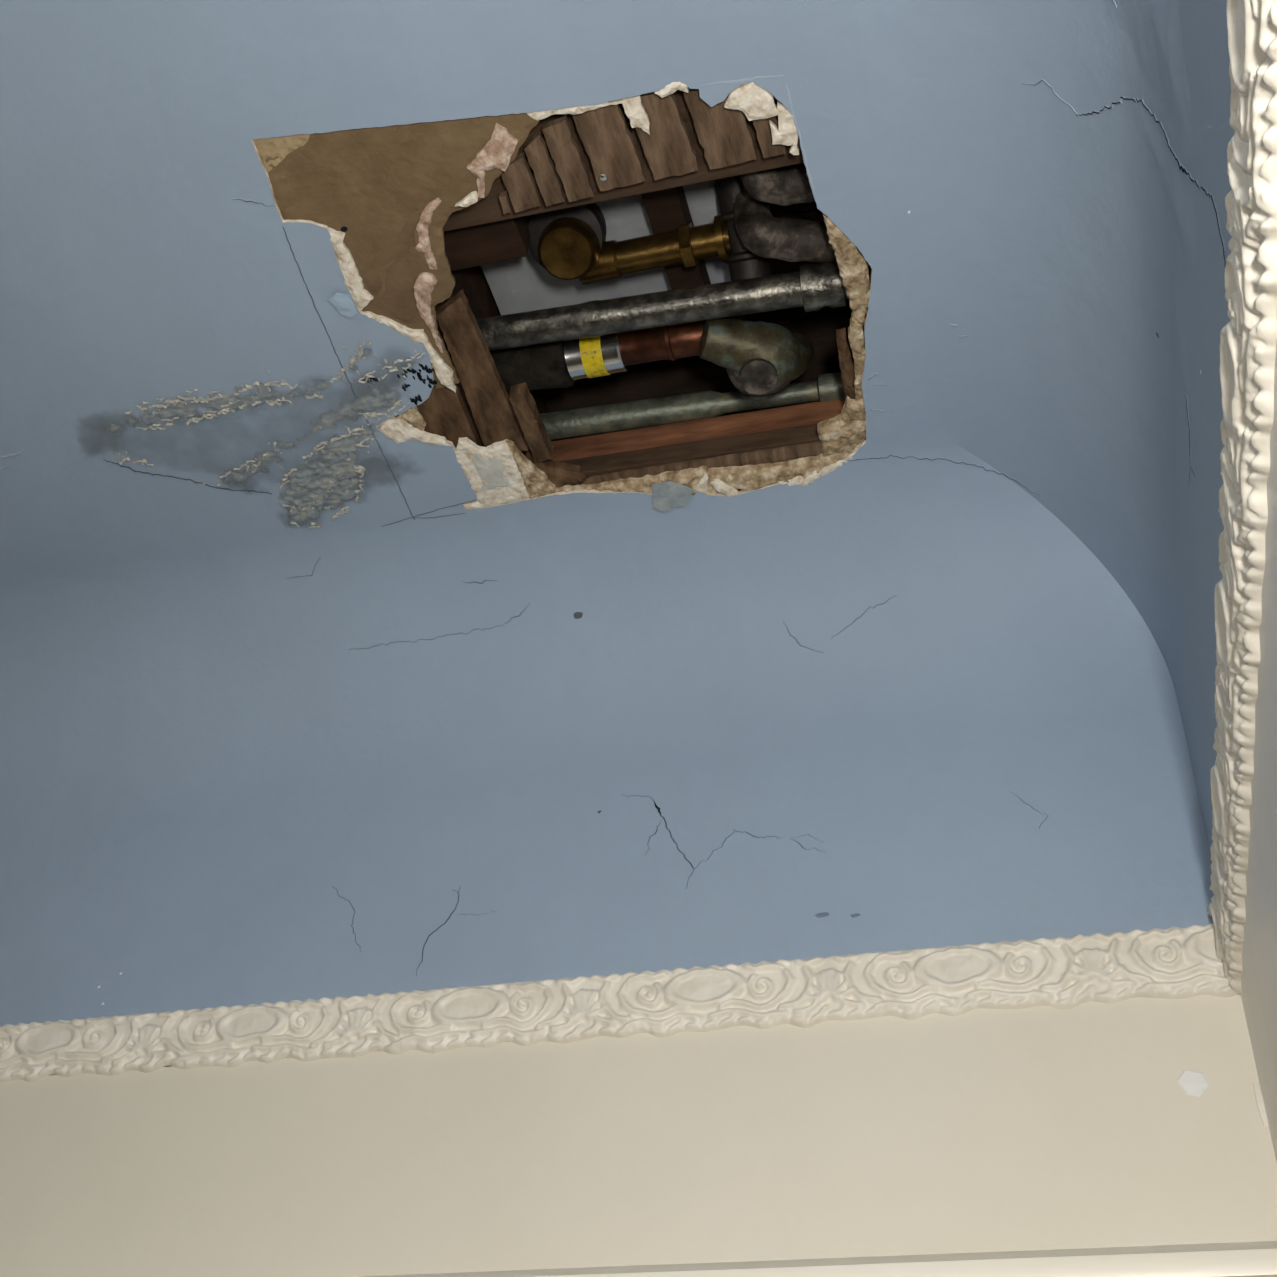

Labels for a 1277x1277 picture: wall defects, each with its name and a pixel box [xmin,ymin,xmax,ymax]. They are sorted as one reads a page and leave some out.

crack [1022,79,1227,266]
spalling [103,82,870,530]
water stain [397,363,437,405]
crack [783,596,894,653]
crack [621,794,827,889]
crack [331,885,362,952]
crack [416,886,495,976]